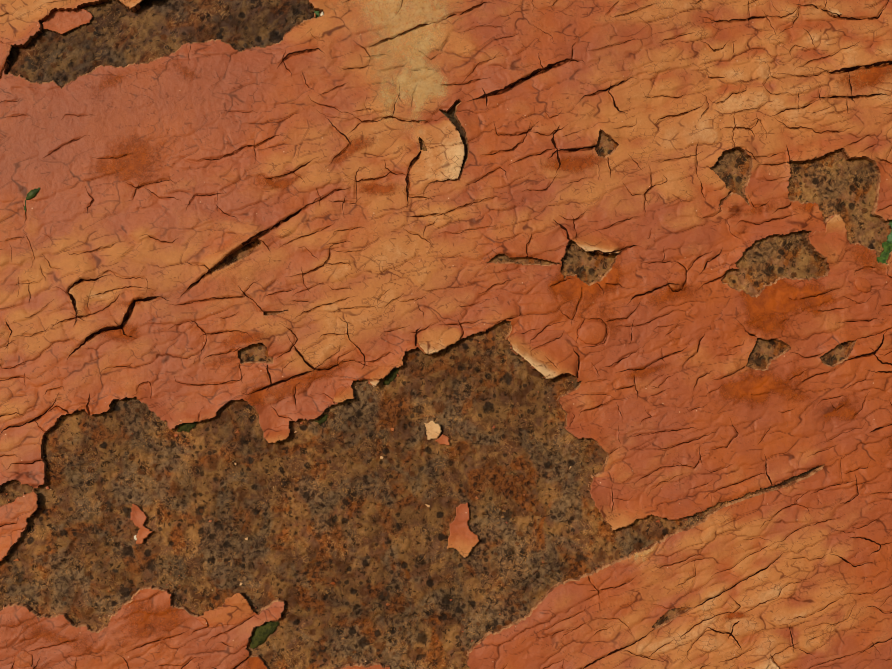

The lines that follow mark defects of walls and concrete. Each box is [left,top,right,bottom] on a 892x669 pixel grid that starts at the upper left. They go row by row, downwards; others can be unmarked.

peeling [0,0,324,89]
crack [581,0,892,181]
peeling [595,129,619,158]
peeling [710,147,753,209]
crack [0,2,799,511]
peeling [487,227,626,286]
peeling [721,148,892,298]
peeling [820,340,857,367]
peeling [0,320,825,669]
crack [535,288,892,669]
rust [246,657,267,669]